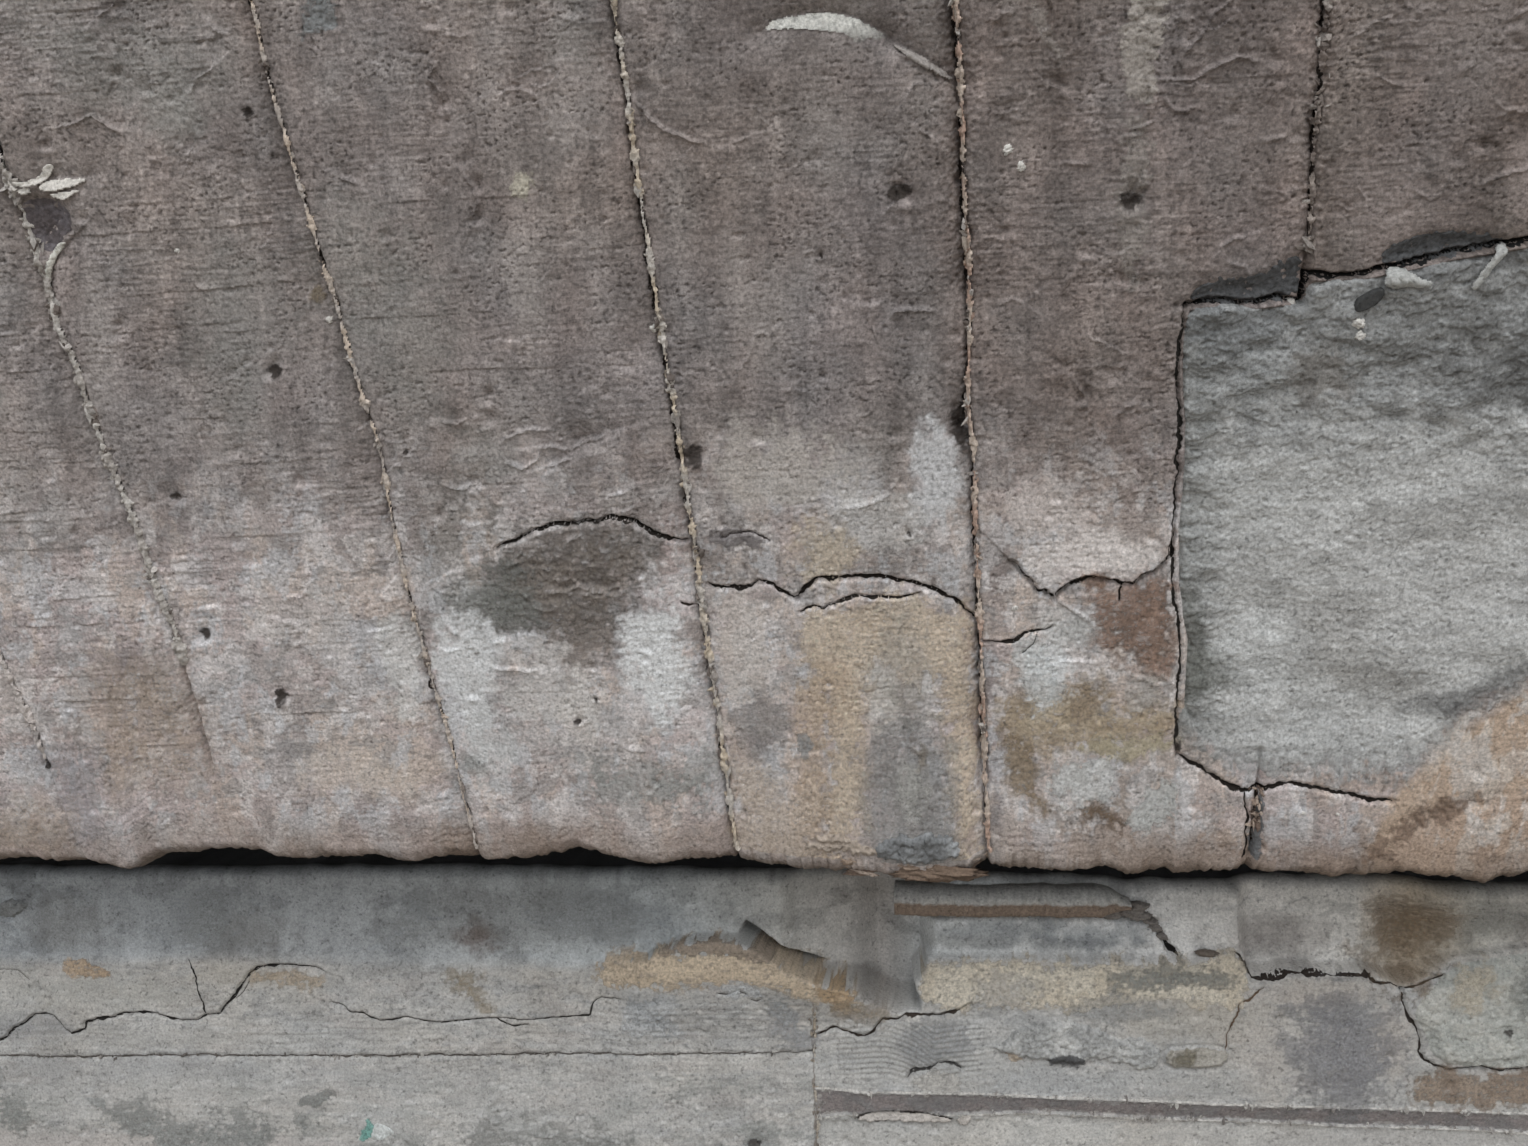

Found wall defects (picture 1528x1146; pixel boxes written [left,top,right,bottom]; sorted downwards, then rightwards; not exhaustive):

peeling [765,12,880,38]
peeling [894,44,953,80]
peeling [2,160,86,200]
spalling [1189,256,1302,304]
spalling [1381,230,1508,290]
crack [497,514,770,547]
crack [681,236,1528,858]
crack [0,959,618,1041]
spalling [596,931,859,1014]
crack [1225,950,1528,1071]